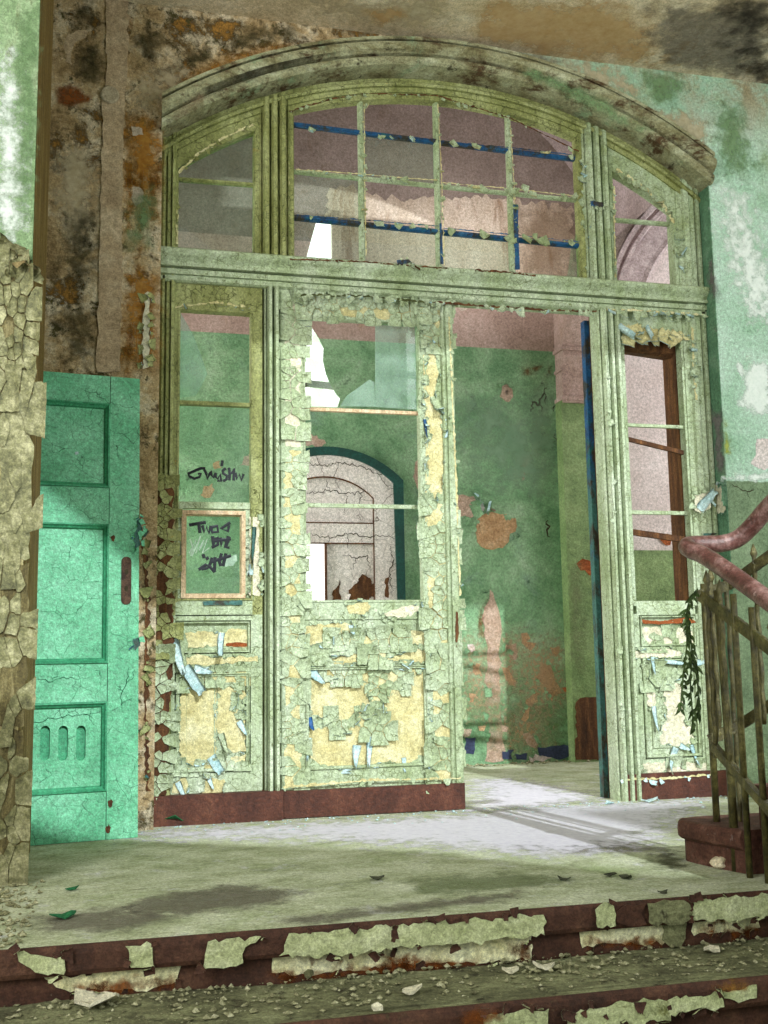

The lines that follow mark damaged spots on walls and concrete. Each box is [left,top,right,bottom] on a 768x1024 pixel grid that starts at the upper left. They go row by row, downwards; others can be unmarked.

mould [79,46,102,82]
water stain [135,28,210,108]
water stain [479,1,768,96]
water stain [54,148,101,280]
rust [124,118,162,232]
rust [122,269,157,373]
crack [307,457,394,597]
peeling [128,284,711,805]
peeling [9,941,183,1000]
rust [313,955,473,978]
peeling [272,907,546,977]
peeling [479,984,757,1024]